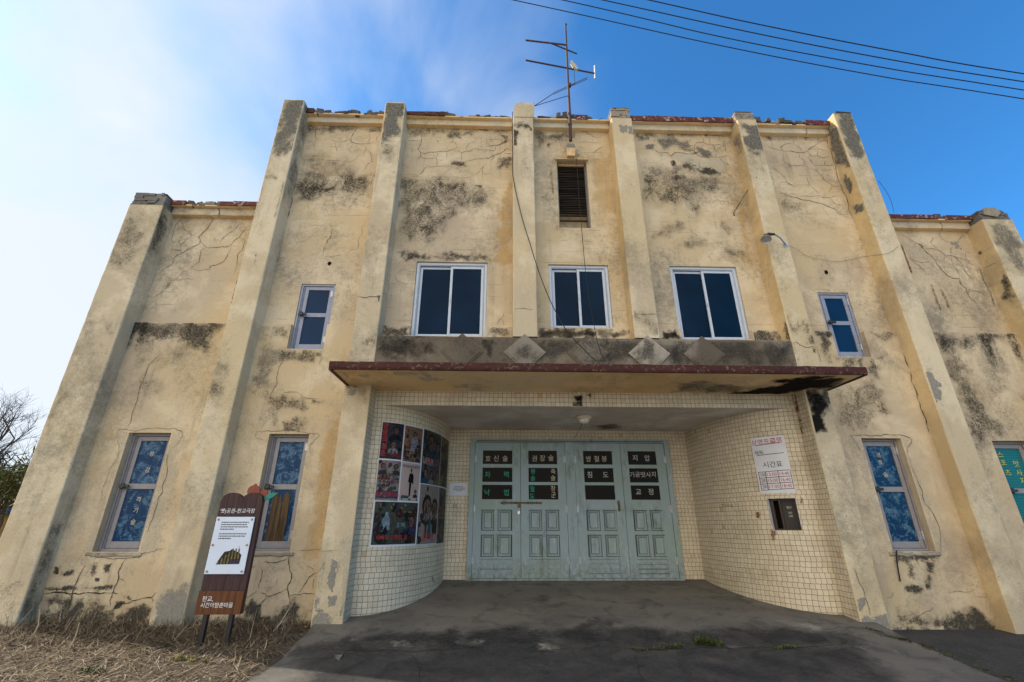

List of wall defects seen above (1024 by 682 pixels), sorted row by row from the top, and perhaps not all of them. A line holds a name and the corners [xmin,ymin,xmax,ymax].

water stain [275,100,364,200]
water stain [639,134,718,209]
crack [777,130,852,215]
crack [149,209,244,300]
crack [905,225,998,311]
water stain [130,322,223,351]
water stain [804,324,884,424]
peeling [926,371,942,402]
water stain [936,333,1020,442]
crack [46,350,183,608]
crack [249,549,340,611]
peeling [311,560,344,626]